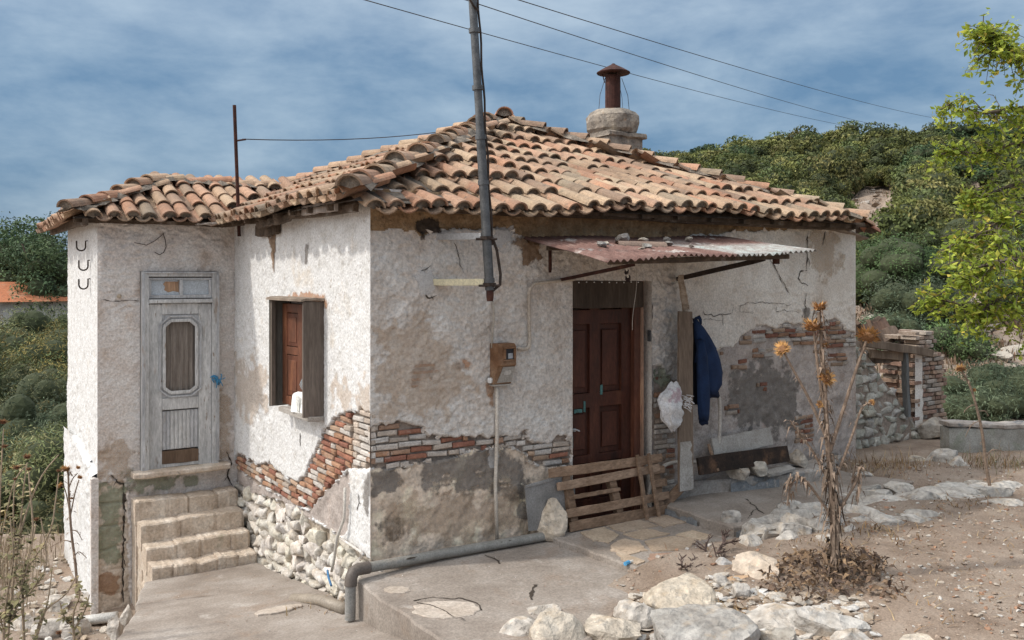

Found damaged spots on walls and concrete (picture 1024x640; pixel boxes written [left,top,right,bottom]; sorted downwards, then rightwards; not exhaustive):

flaking render [371,208,787,247]
crack [703,233,827,321]
flaking render [652,318,856,492]
crack [111,475,127,602]
damp [363,467,403,545]
flaking render [234,408,572,602]
damp [421,447,531,520]